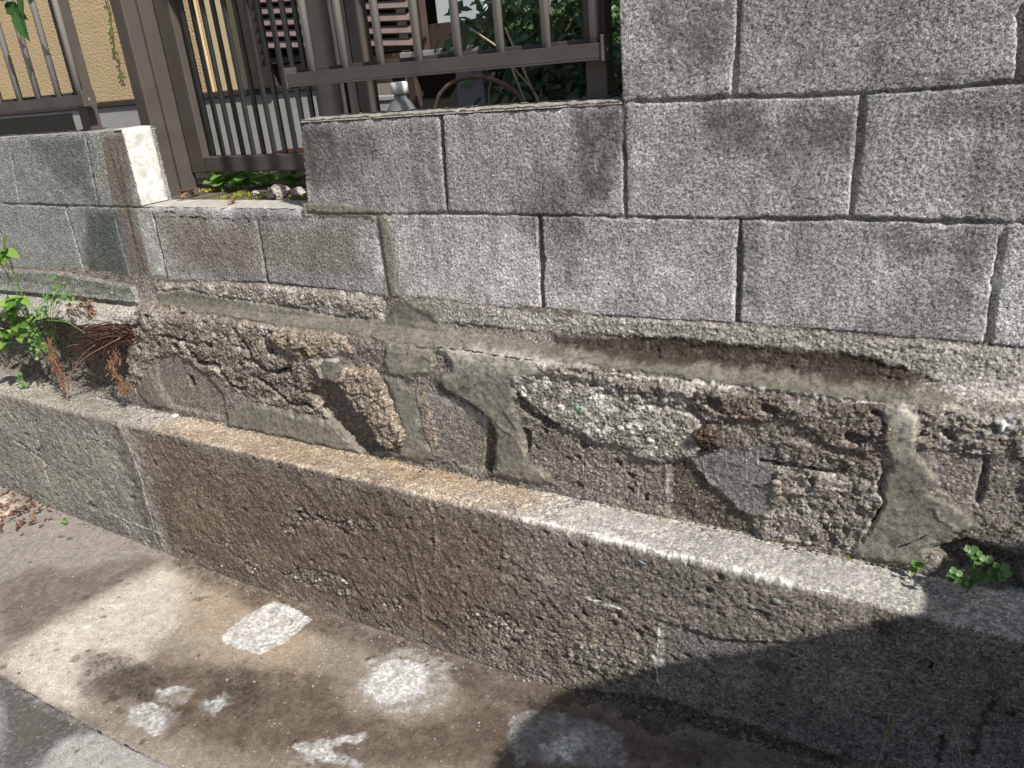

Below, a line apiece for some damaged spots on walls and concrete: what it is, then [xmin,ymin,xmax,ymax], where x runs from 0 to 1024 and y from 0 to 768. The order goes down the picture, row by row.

crack [426,346,538,362]